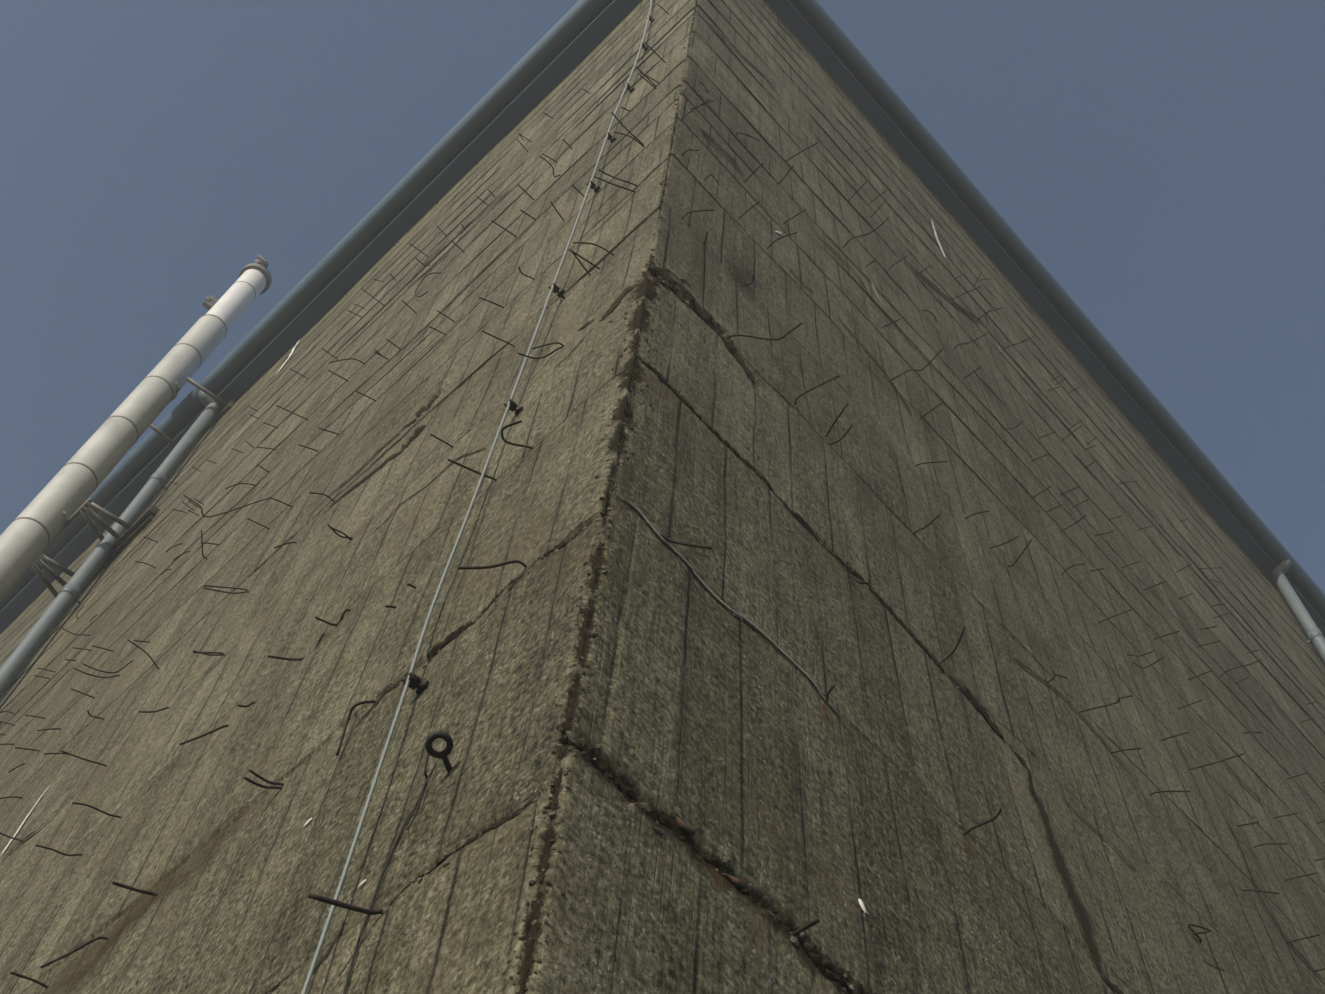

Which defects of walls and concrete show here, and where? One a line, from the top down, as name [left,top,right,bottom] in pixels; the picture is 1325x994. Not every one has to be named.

crack [812,228,943,376]
crack [367,448,487,537]
crack [357,526,587,720]
crack [622,360,1141,876]